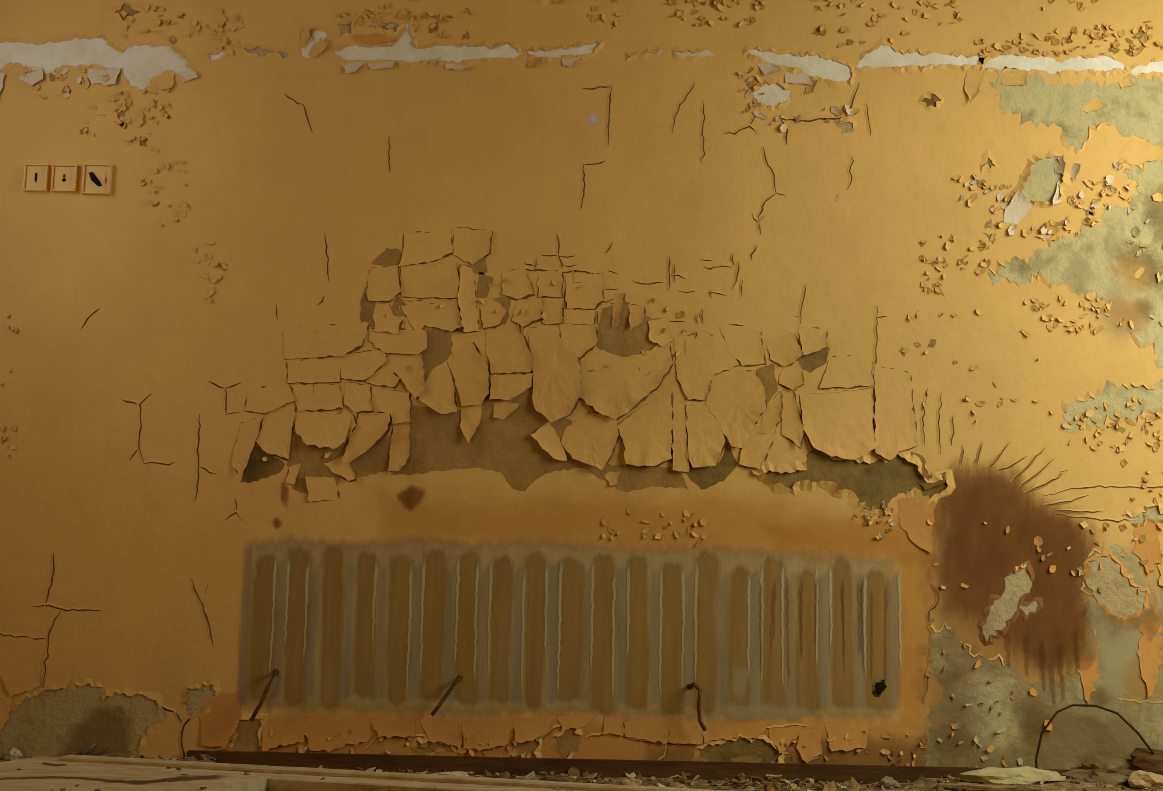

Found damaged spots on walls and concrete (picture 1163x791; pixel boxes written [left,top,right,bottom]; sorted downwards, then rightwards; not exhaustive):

peeling [0,1,605,226]
crack [670,81,871,289]
peeling [738,0,1163,467]
crack [0,553,101,688]
peeling [0,637,167,758]
crack [122,379,241,502]
crack [189,578,213,647]
crack [223,498,243,522]
damp [239,538,902,719]
peeling [231,227,956,566]
peeling [182,470,1163,770]
corrosion [941,441,1105,665]